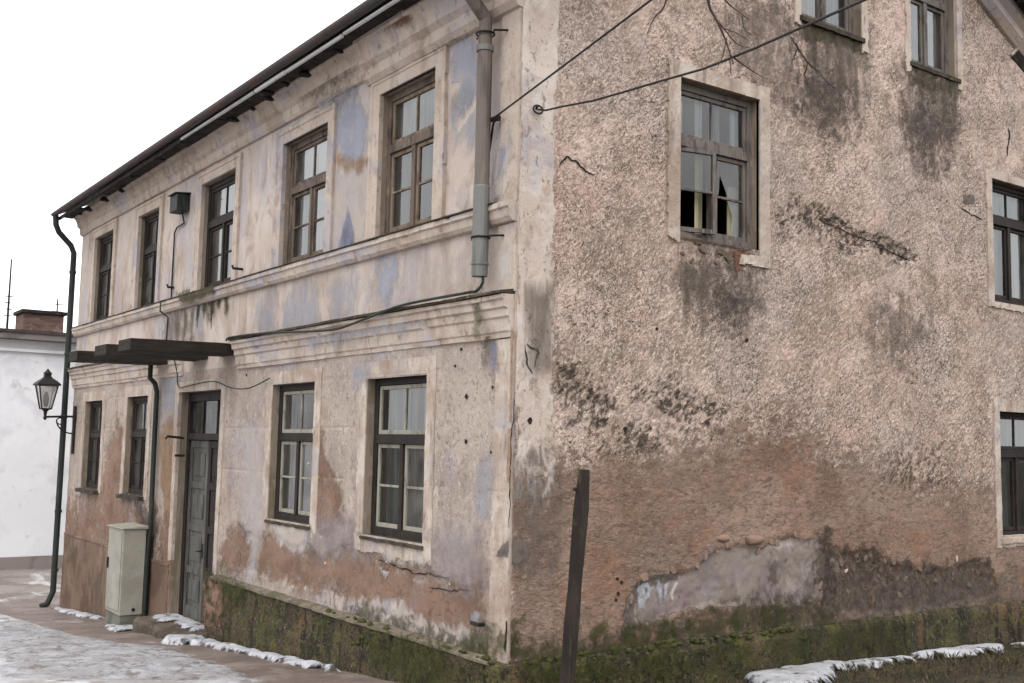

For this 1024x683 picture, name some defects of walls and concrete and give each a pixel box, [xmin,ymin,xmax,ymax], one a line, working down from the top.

peeling [333,87,367,171]
crack [559,156,595,176]
water stain [196,297,228,321]
crack [524,344,540,374]
peeling [491,0,1024,662]
water stain [598,418,668,453]
peeling [65,412,173,616]
peeling [217,429,487,645]